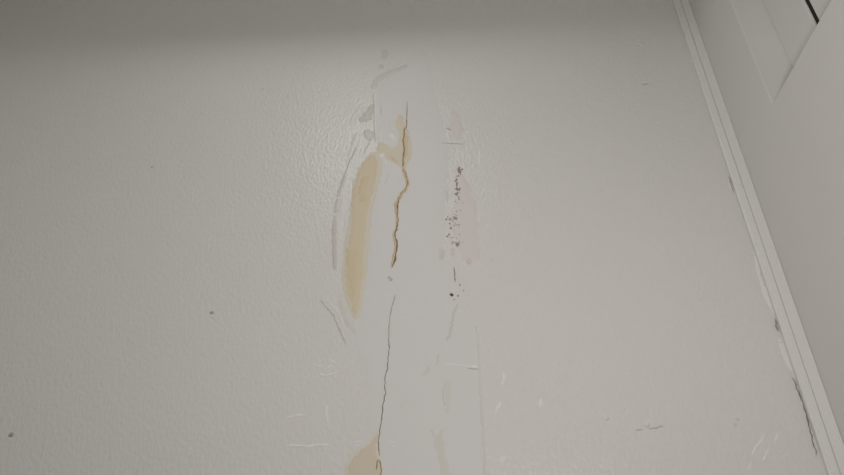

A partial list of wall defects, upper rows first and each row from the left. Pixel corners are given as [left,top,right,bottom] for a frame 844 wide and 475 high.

peeling [344,153,387,315]
damp [331,104,412,335]
crack [392,109,408,268]
crack [376,296,395,475]